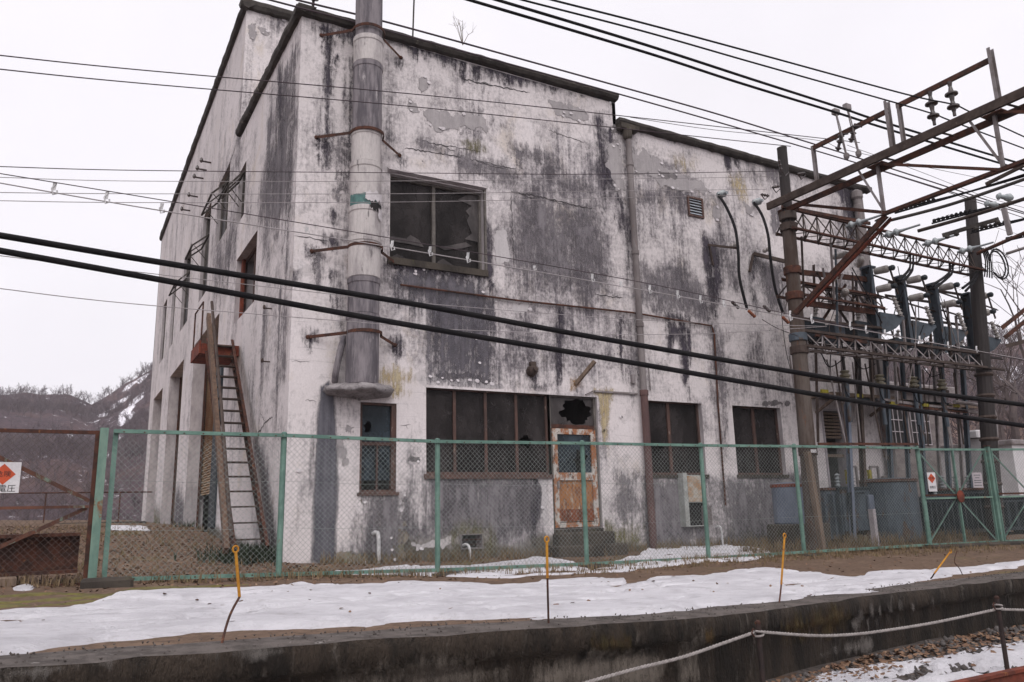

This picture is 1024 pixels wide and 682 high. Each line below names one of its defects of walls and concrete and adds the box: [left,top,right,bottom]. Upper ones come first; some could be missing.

leakage [258,42,298,415]
leakage [305,24,355,309]
leakage [393,223,500,387]
peeling [408,76,494,135]
leakage [532,309,564,390]
leakage [511,198,604,291]
peeling [548,100,589,122]
peeling [605,124,711,194]
leakage [594,116,730,444]
leakage [311,382,339,563]